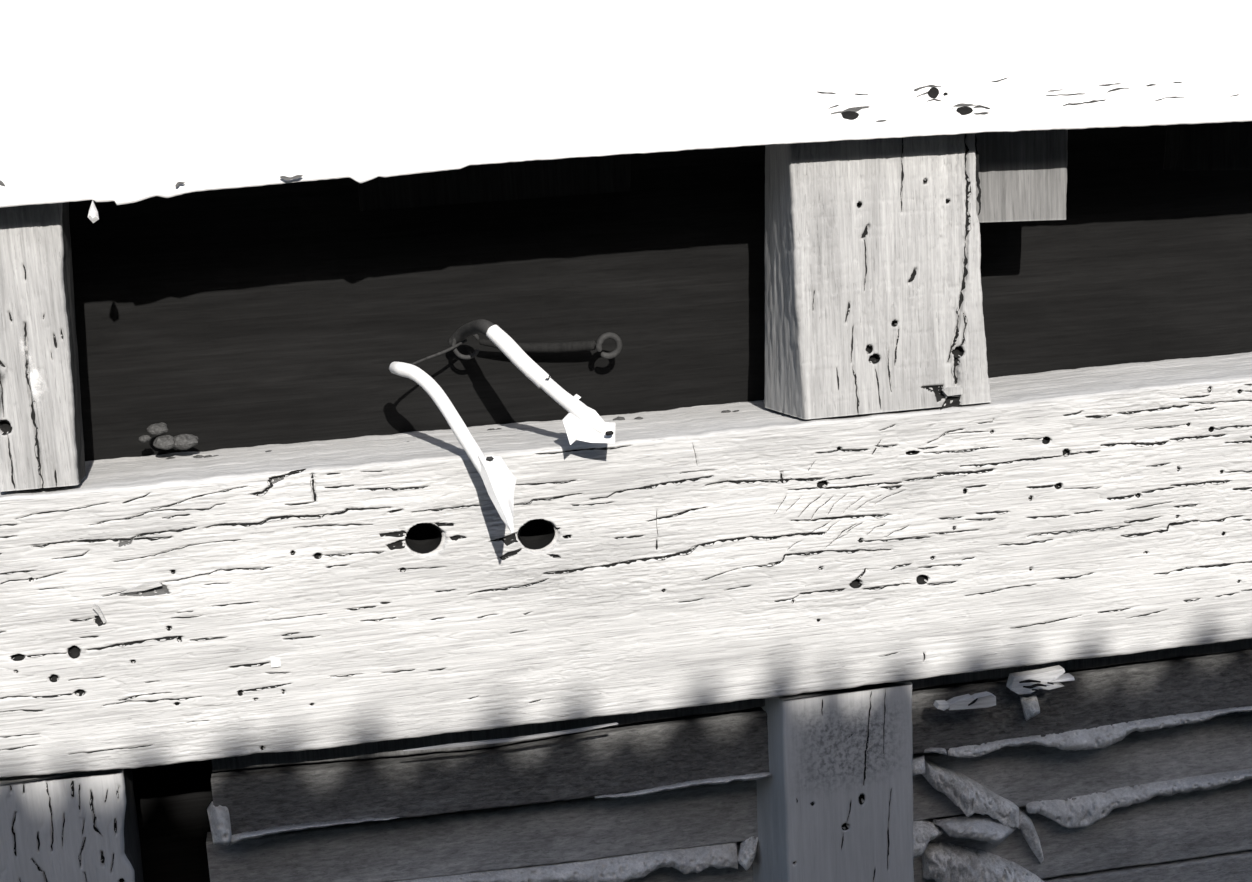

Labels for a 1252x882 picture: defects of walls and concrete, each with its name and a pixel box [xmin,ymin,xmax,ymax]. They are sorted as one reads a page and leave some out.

crack [914,77,1009,384]
crack [0,226,1252,750]
crack [10,745,151,882]
crack [841,691,892,881]